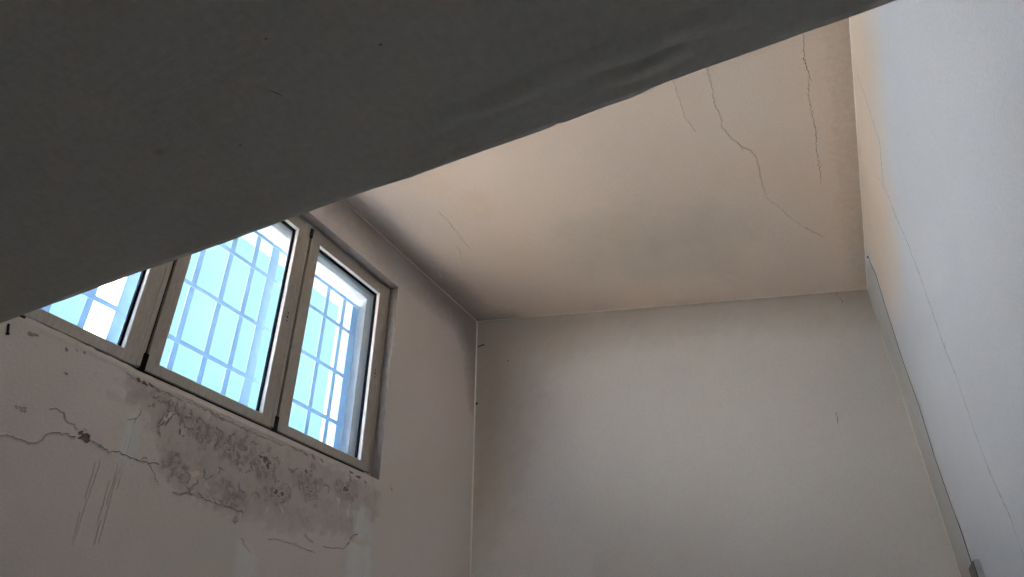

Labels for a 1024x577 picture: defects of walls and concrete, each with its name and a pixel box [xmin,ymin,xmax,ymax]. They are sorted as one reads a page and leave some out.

crack [673,67,824,238]
crack [802,33,822,183]
crack [855,67,1024,555]
crack [0,407,165,486]
water stain [108,399,183,495]
spalling [224,434,274,471]